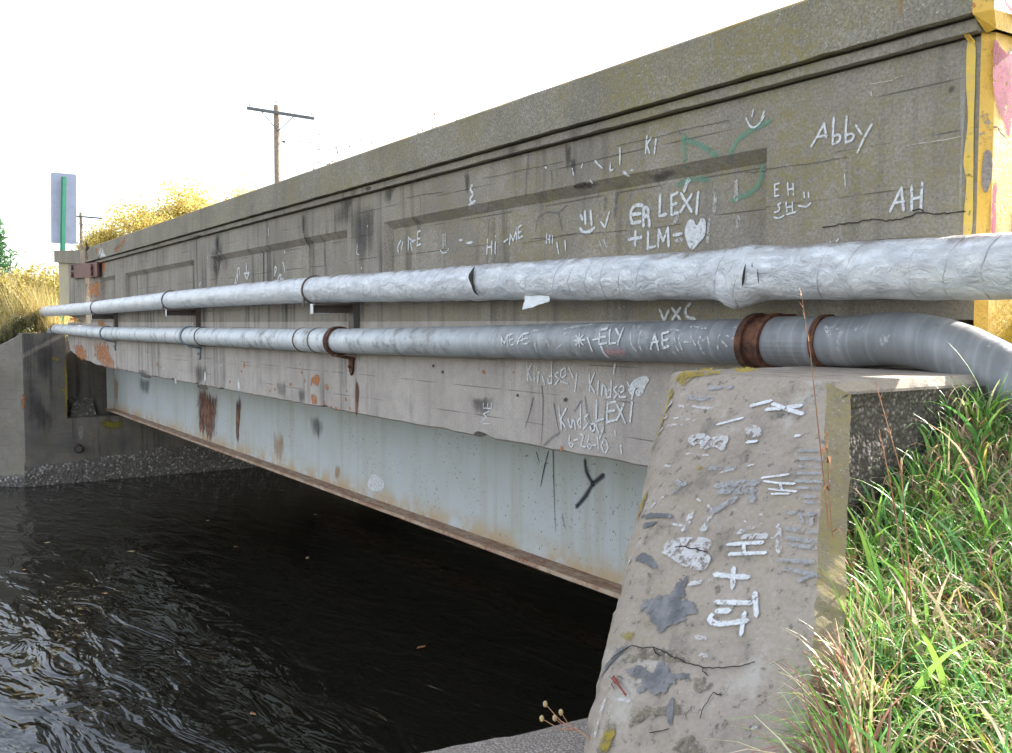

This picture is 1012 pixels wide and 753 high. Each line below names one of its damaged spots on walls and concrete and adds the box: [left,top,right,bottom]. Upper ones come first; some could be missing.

crack [822,208,966,228]
corrosion [74,341,118,397]
corrosion [198,390,216,440]
corrosion [301,372,359,415]
crack [611,645,755,718]